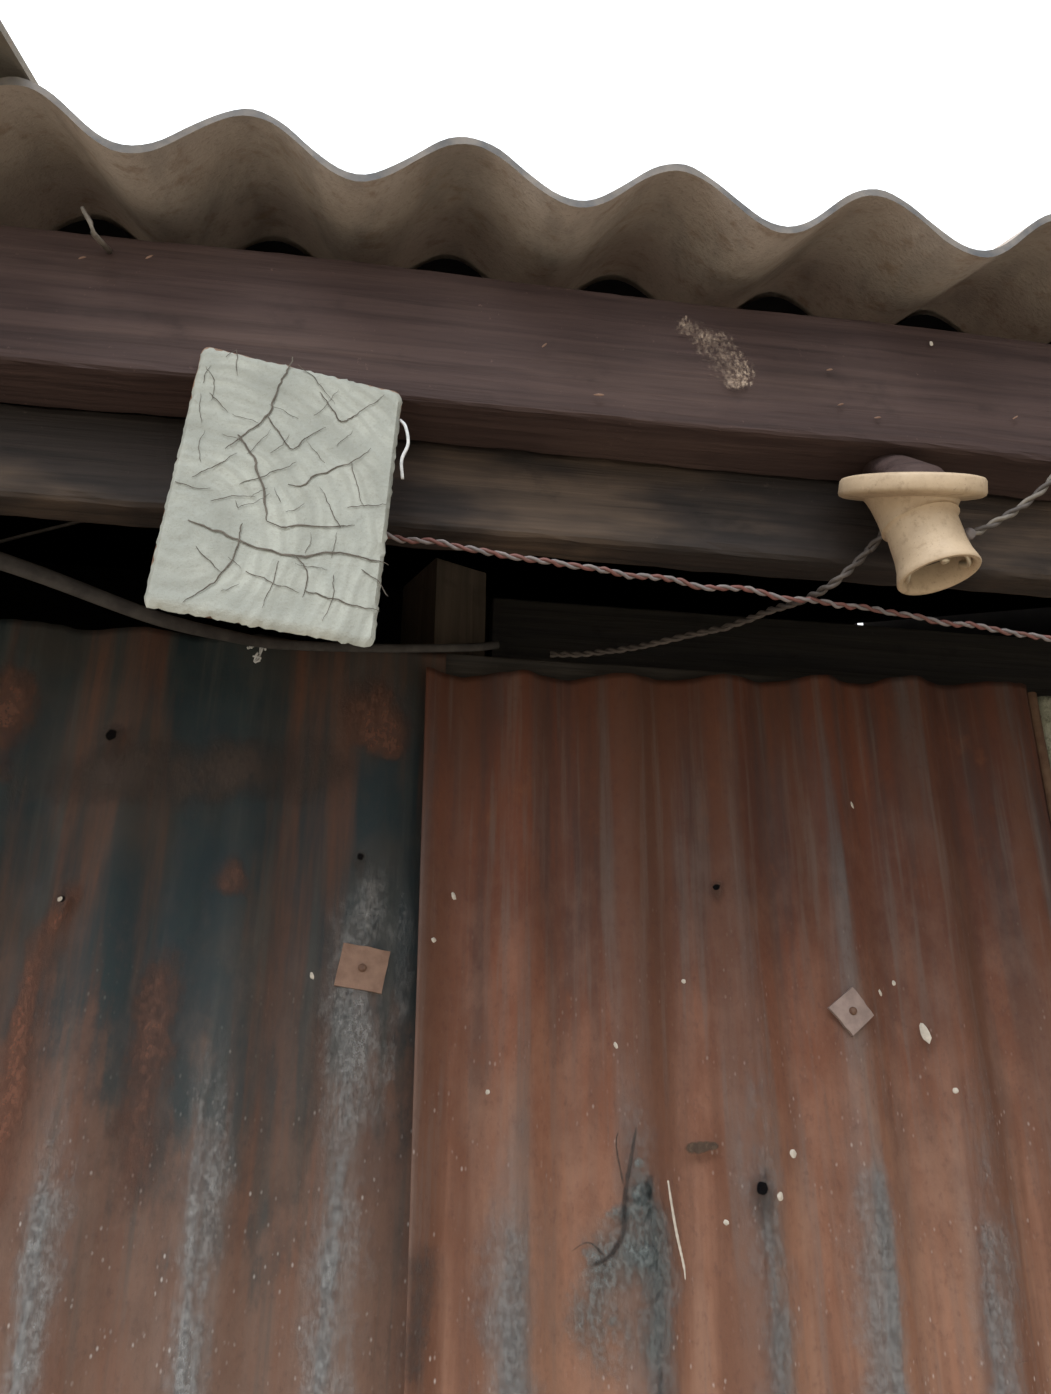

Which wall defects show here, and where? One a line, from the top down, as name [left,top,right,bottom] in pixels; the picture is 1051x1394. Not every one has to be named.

crack [175,349,388,621]